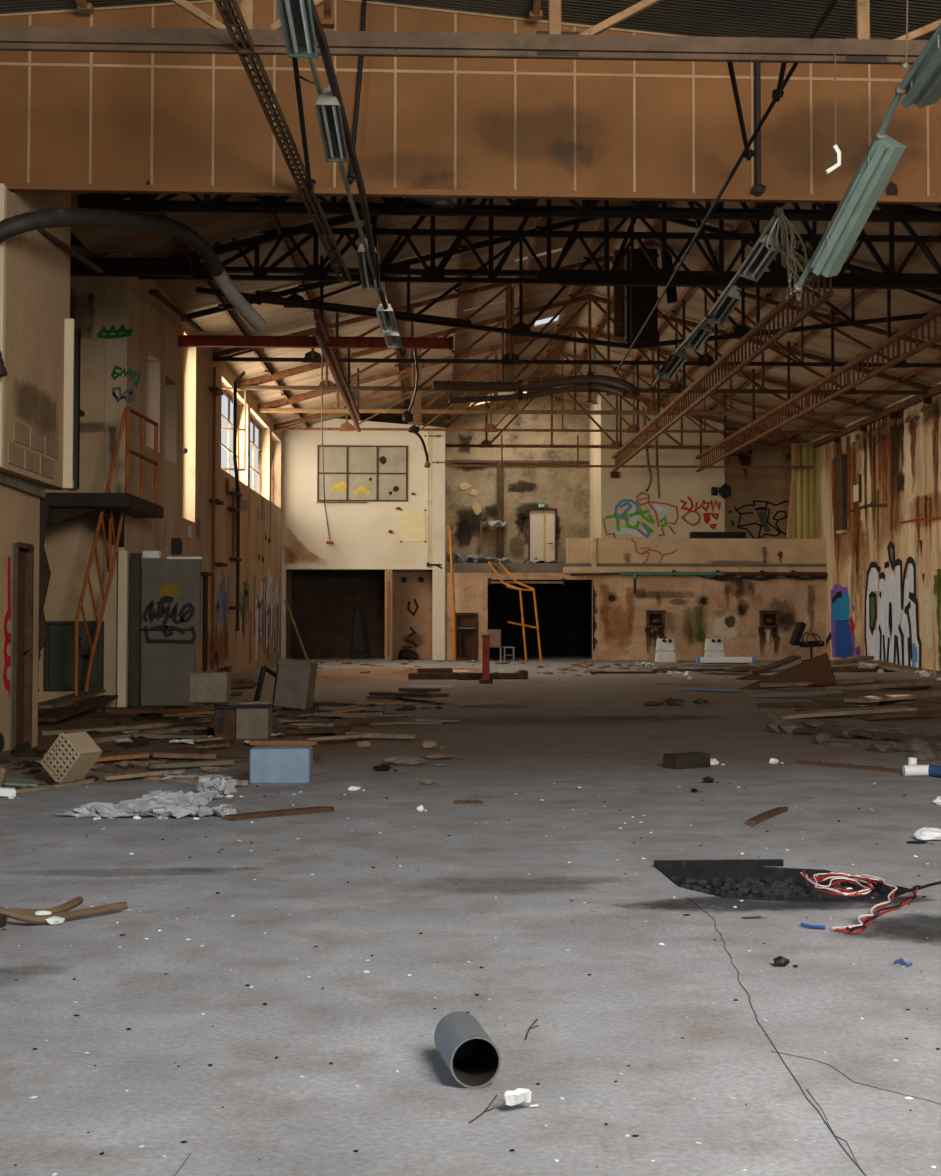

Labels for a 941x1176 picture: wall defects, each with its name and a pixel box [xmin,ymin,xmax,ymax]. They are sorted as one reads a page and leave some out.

leakage [509,481,535,492]
corrosion [831,402,916,585]
corrosion [916,402,941,553]
leakage [486,505,497,518]
leakage [455,521,472,546]
leakage [516,513,528,543]
crack [686,897,941,1176]